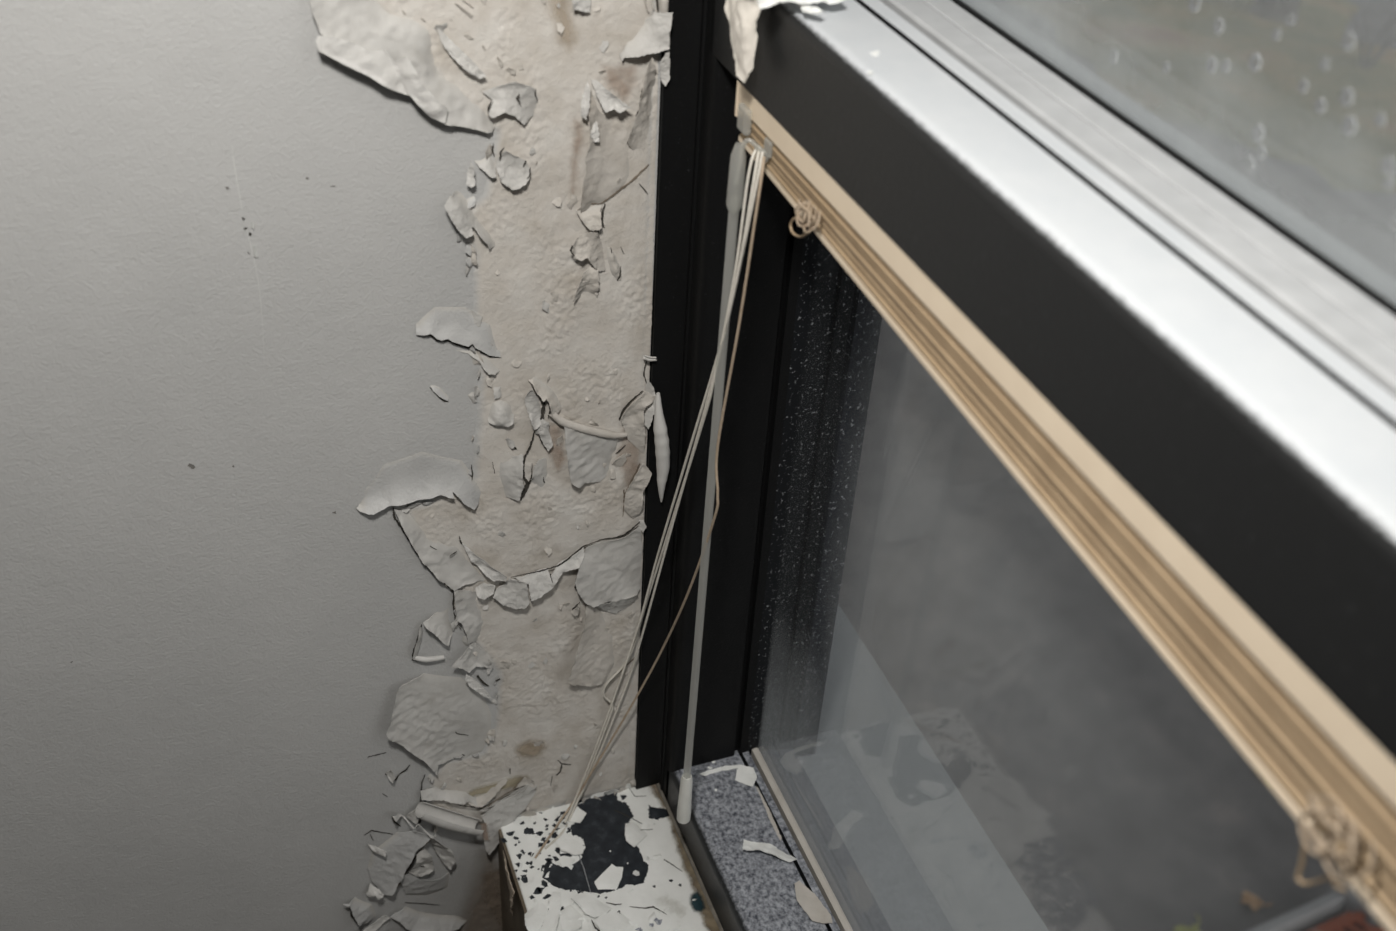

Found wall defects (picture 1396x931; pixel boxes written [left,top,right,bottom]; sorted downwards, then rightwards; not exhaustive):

flaking render [310,0,682,931]
peeling [725,0,844,83]